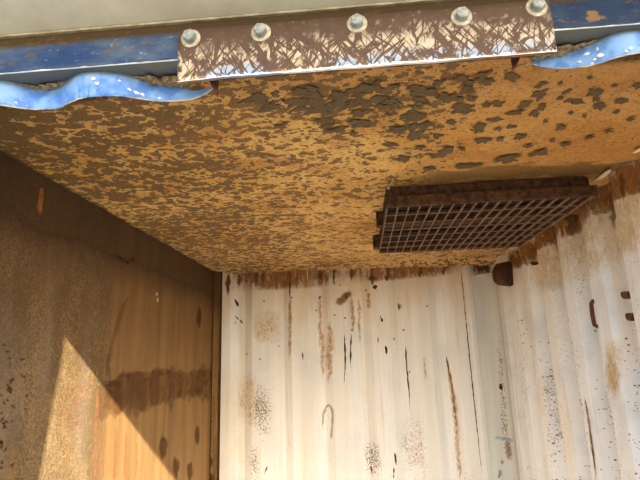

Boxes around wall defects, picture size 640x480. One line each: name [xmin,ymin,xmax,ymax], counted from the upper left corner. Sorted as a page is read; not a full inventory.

peeling [505,72,521,83]
peeling [237,70,506,151]
peeling [472,82,549,164]
peeling [556,81,629,115]
peeling [429,146,466,159]
corrosion [510,162,640,266]
corrosion [226,269,340,295]
corrosion [350,266,455,289]
corrosion [473,265,490,275]